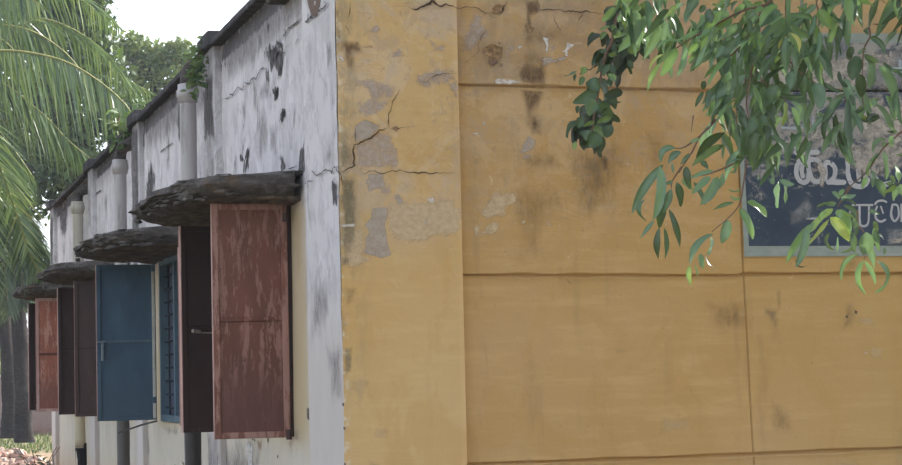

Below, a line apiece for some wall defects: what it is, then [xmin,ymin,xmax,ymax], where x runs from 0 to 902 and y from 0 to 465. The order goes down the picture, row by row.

leakage [221,0,294,140]
crack [282,2,328,54]
crack [404,0,507,83]
spalling [467,16,522,67]
peeling [542,37,574,65]
crack [537,1,598,30]
leakage [50,153,114,265]
leakage [129,91,180,228]
leakage [196,73,213,176]
crack [289,92,454,195]
peeling [341,80,461,267]
peeling [474,192,516,235]